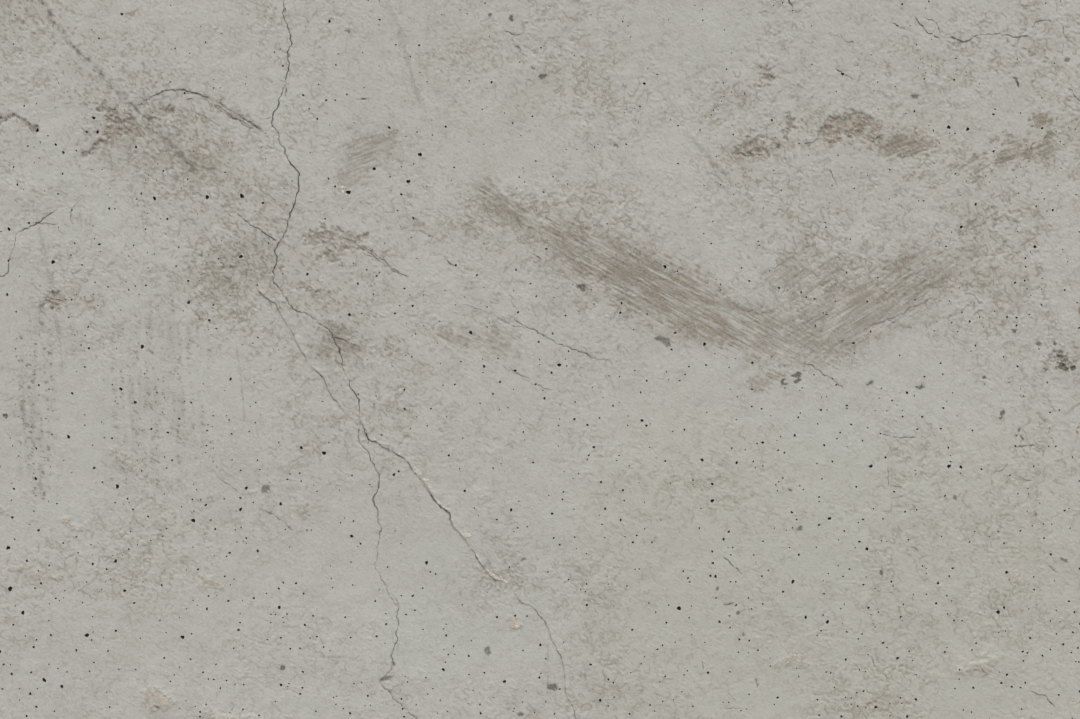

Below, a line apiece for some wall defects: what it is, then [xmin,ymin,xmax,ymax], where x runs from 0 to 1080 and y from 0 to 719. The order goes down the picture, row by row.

crack [239,8,300,310]
crack [319,324,508,584]